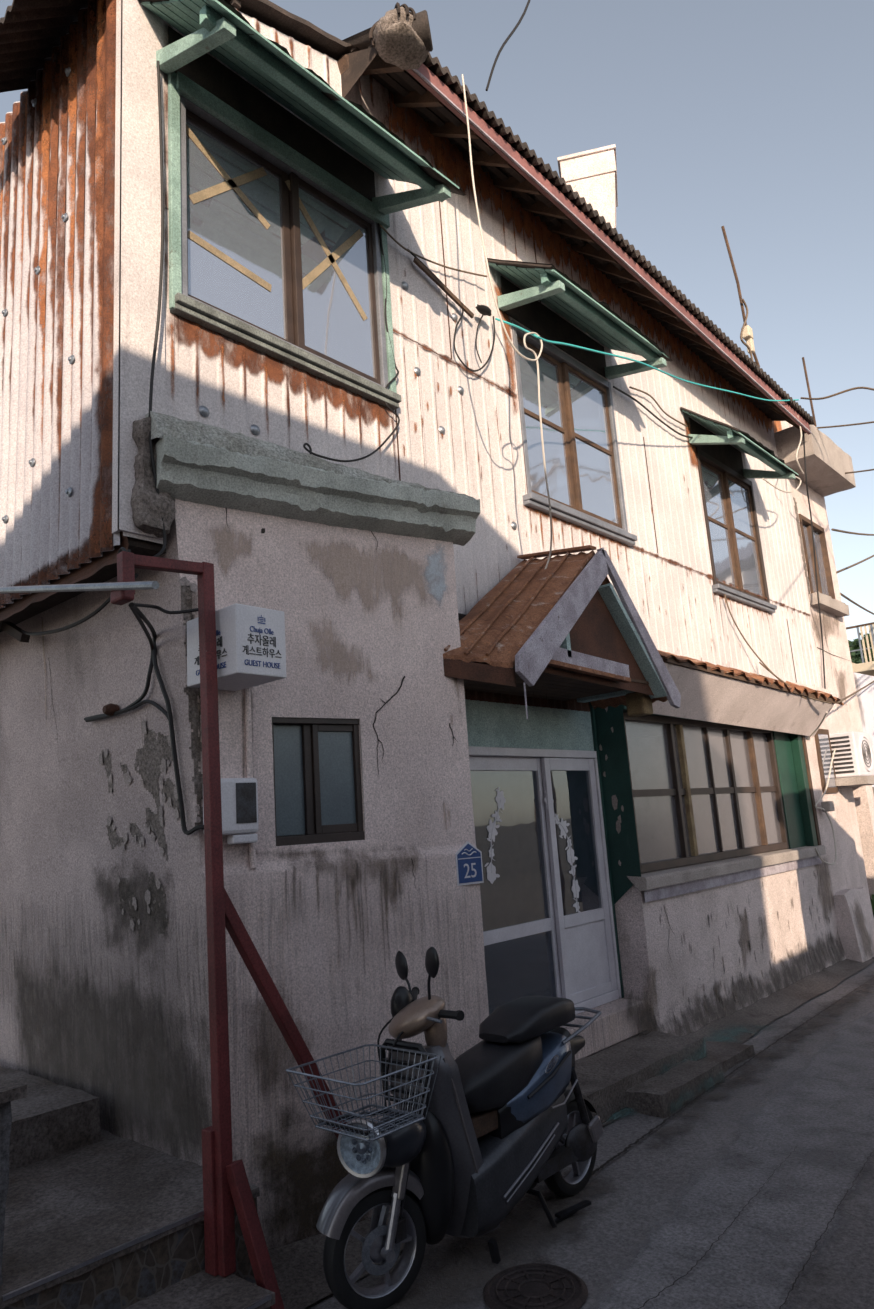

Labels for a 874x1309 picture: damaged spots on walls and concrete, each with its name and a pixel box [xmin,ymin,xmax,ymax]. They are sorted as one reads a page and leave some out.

rust [0,0,116,608]
rust [171,286,810,661]
flaking render [178,577,198,656]
flaking render [99,720,179,861]
flaking render [184,685,203,826]
crack [373,676,405,775]
damp [97,873,166,953]
flaking render [116,872,169,936]
damp [816,863,834,918]
damp [628,934,844,1037]
damp [16,963,209,1156]